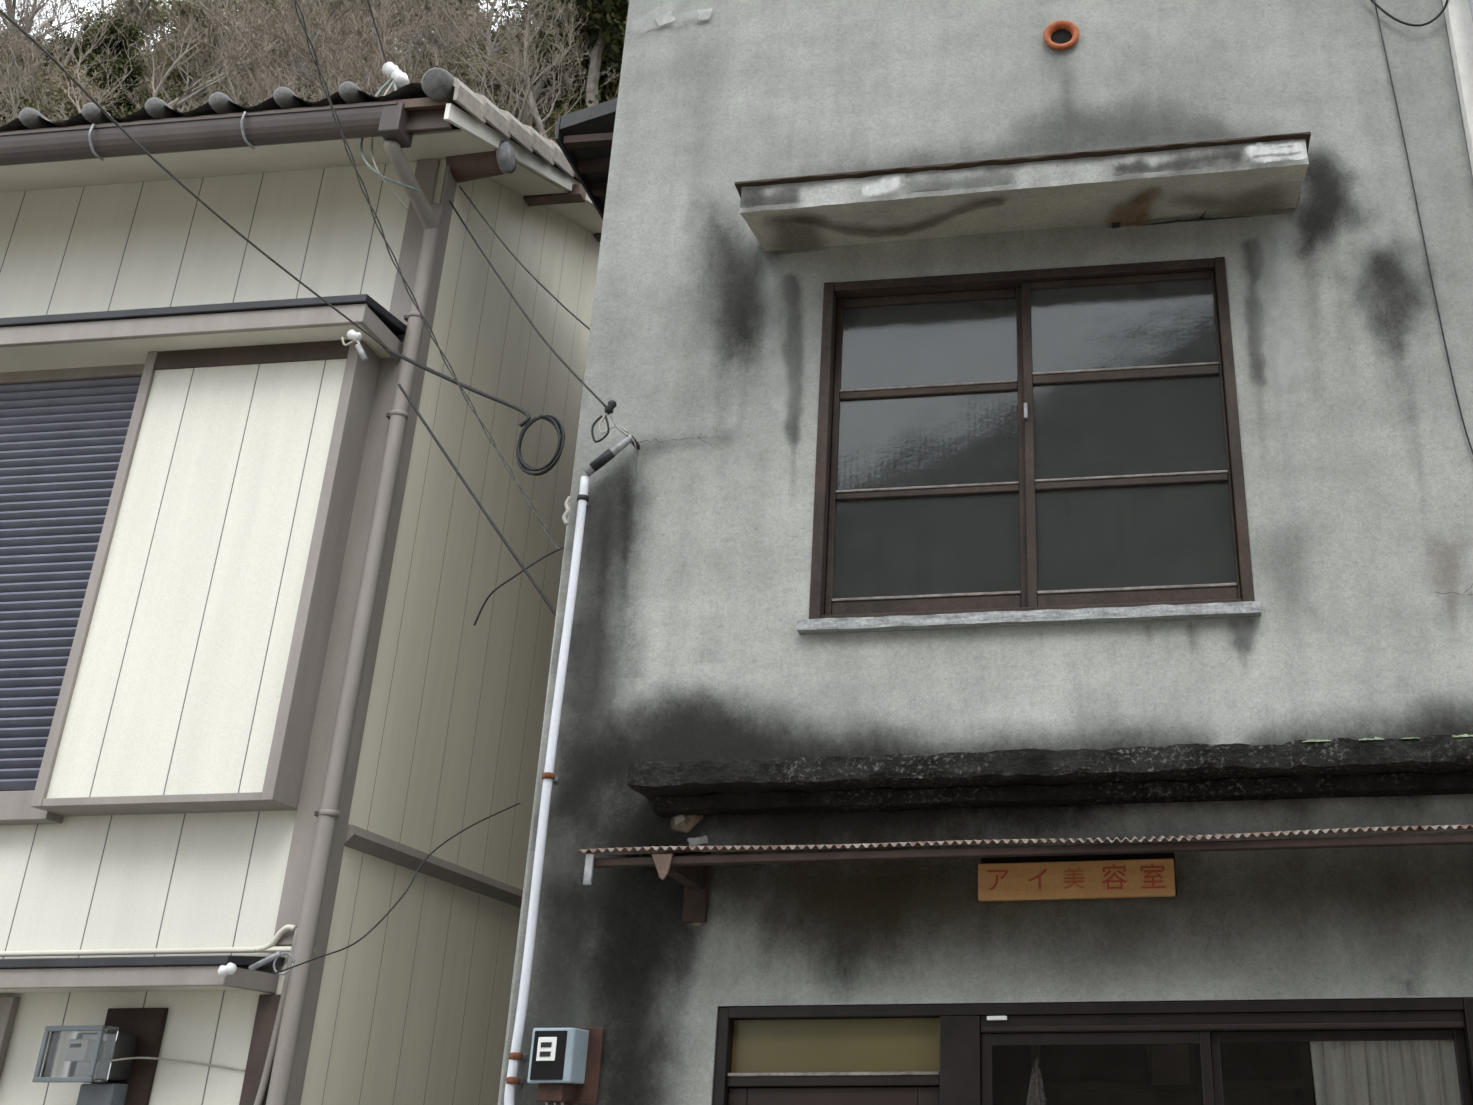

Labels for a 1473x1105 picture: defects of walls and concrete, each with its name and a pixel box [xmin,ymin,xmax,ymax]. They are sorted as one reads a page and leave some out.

rust [1109,190,1158,228]
leakage [1295,153,1355,253]
leakage [710,226,761,344]
leakage [1369,253,1419,323]
leakage [783,275,801,441]